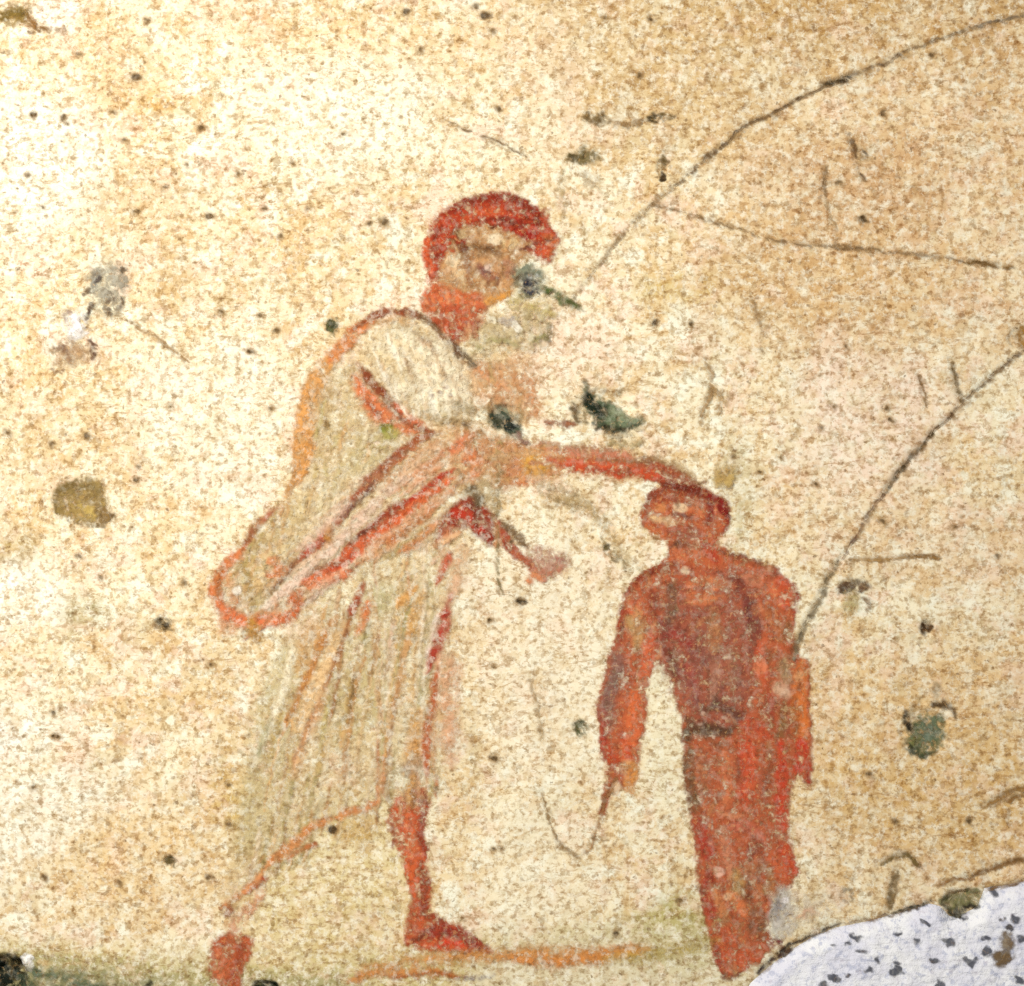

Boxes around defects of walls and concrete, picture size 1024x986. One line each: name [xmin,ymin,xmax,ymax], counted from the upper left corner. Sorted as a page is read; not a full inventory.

crack [578,14,1024,292]
crack [792,350,1024,661]
damp [903,701,956,759]
flaking render [769,888,823,937]
flaking render [938,886,998,920]
spalling [999,914,1024,943]
spalling [820,973,850,986]
spalling [832,934,879,972]
spalling [889,962,902,976]
spalling [963,936,992,968]